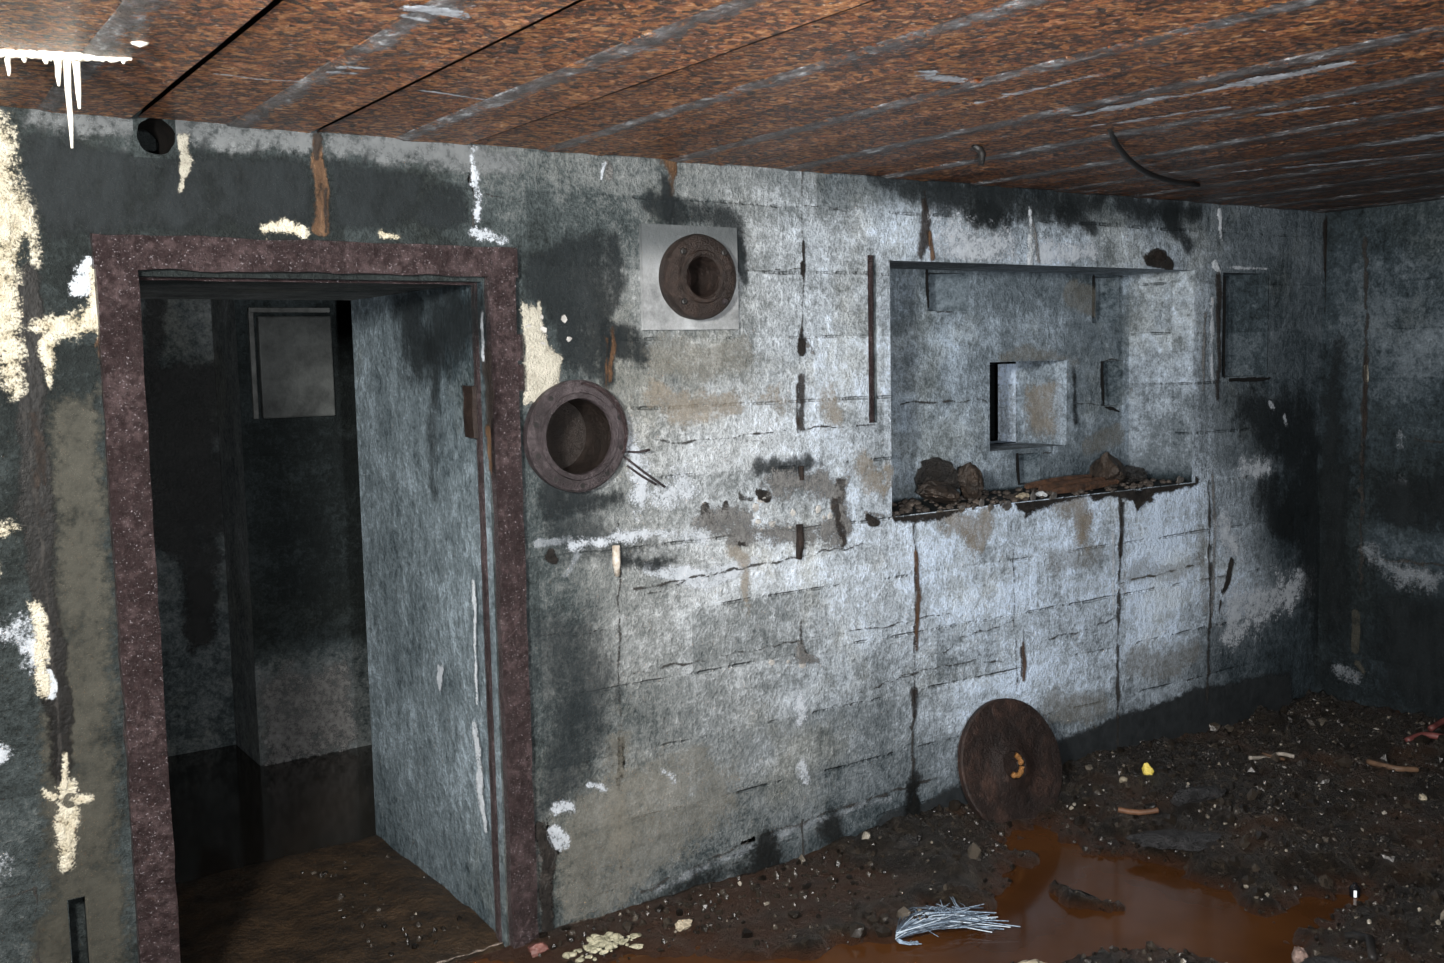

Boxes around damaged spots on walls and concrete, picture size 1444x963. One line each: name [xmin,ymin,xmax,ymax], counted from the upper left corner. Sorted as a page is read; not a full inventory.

rust [311,133,330,236]
damp [643,176,747,285]
damp [525,233,649,387]
damp [0,109,521,963]
damp [538,437,700,517]
damp [569,529,757,591]
damp [1219,336,1350,645]
damp [795,693,807,725]
crack [543,474,1217,910]
damp [546,802,574,850]
damp [650,830,781,902]
damp [816,811,843,845]